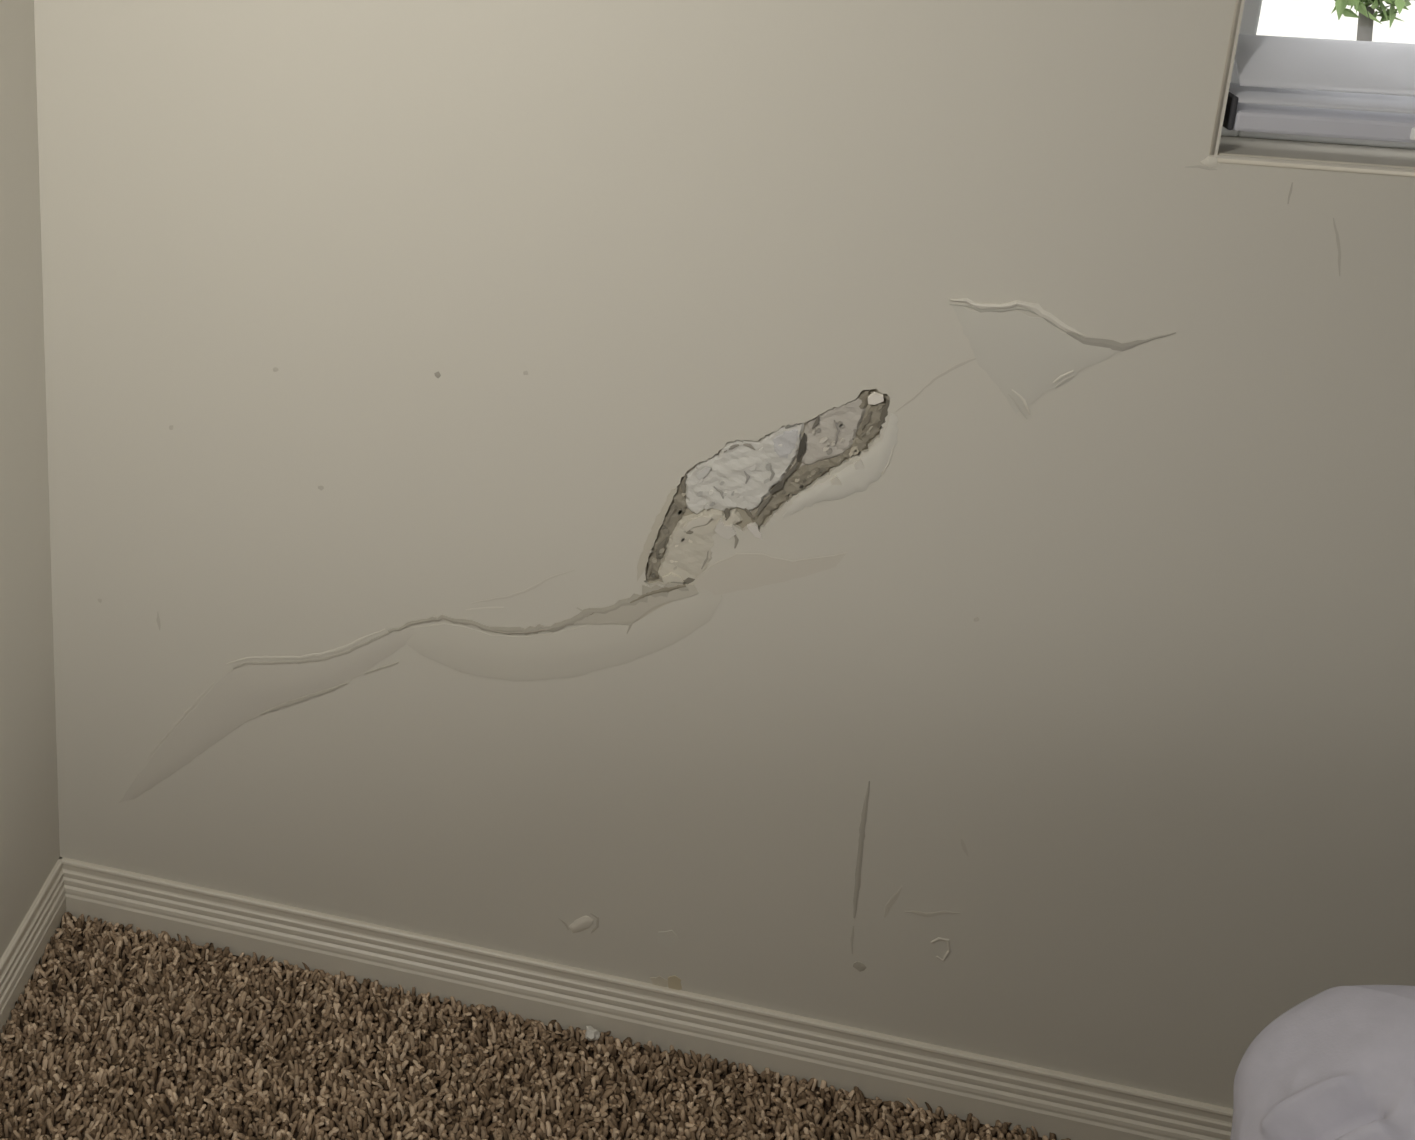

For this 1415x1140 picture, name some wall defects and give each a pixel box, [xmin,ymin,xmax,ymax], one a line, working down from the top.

crack [949,304,1176,388]
spalling [645,389,890,584]
crack [233,582,689,715]
crack [851,781,870,954]